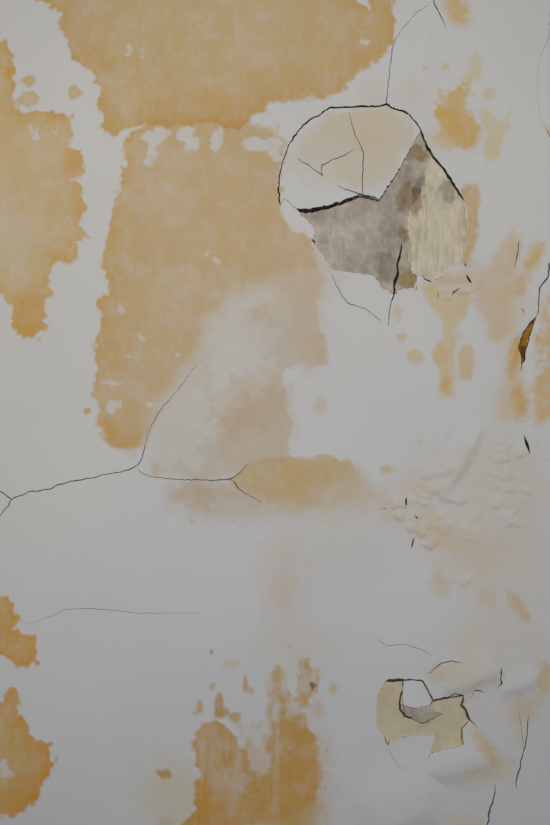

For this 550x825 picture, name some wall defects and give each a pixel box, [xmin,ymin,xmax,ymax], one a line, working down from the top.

crack [277,0,465,213]
damp [0,37,91,343]
spalling [298,132,466,294]
damp [34,0,550,677]
crack [518,263,550,369]
crack [0,368,261,515]
damp [0,595,42,670]
damp [0,685,59,821]
damp [121,742,201,825]
damp [315,721,342,825]
peeling [376,678,478,753]
crack [516,717,528,787]